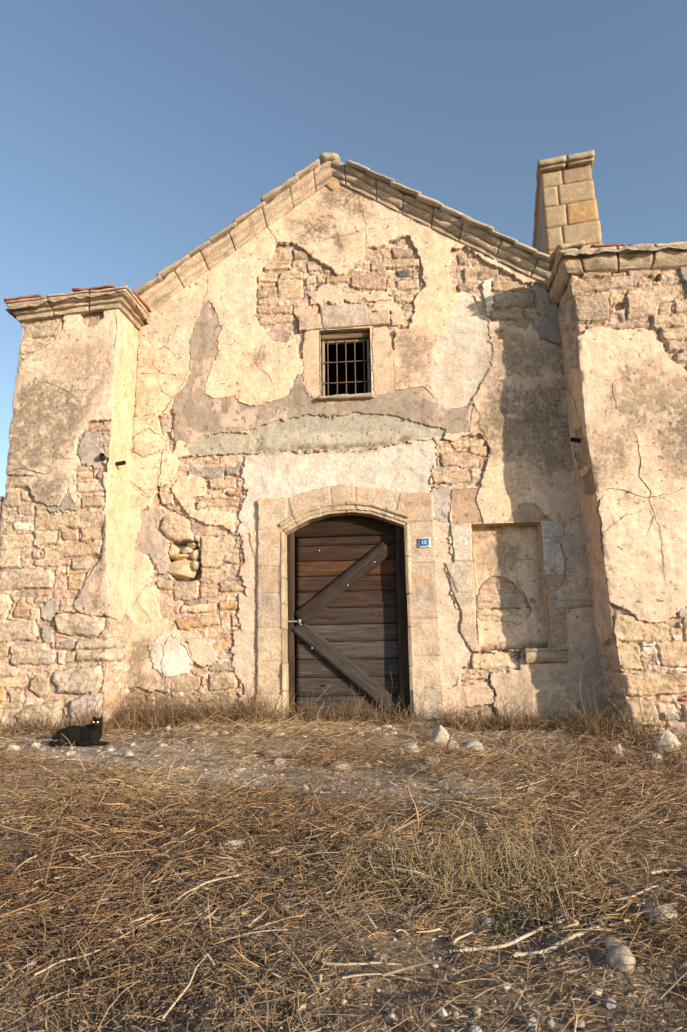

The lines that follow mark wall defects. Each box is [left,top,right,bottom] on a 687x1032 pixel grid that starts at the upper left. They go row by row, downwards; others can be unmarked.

crack [113,276,209,517]
spalling [0,238,687,738]
crack [466,362,678,576]